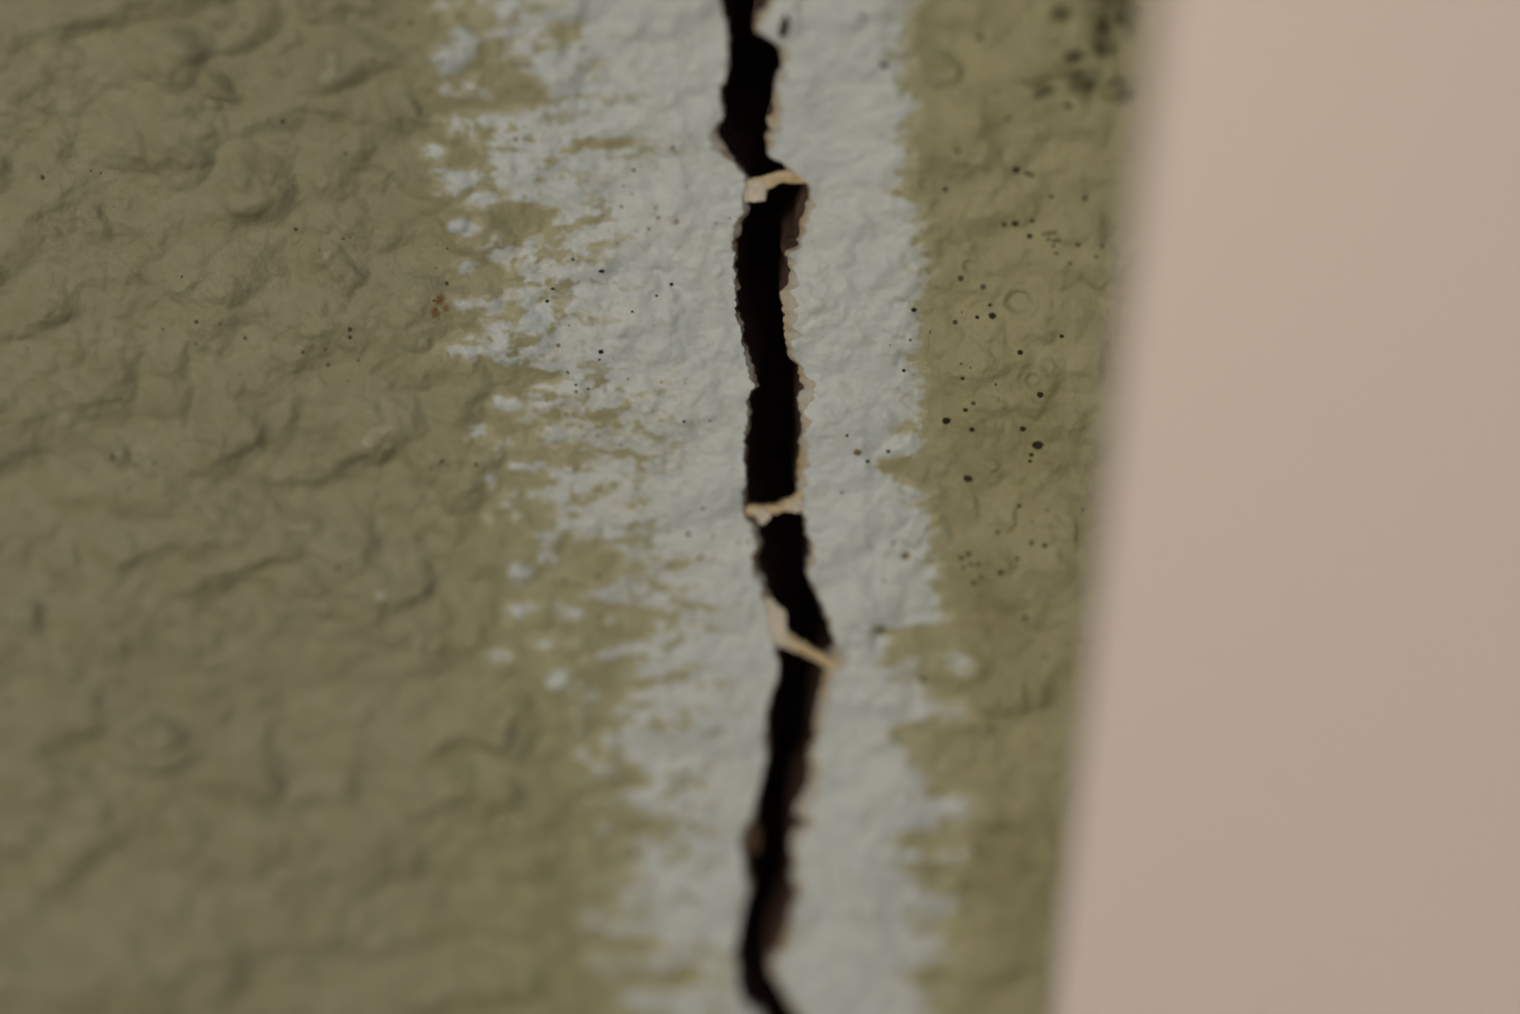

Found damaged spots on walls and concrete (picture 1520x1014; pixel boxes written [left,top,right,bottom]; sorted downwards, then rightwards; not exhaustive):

crack [708,0,849,1014]